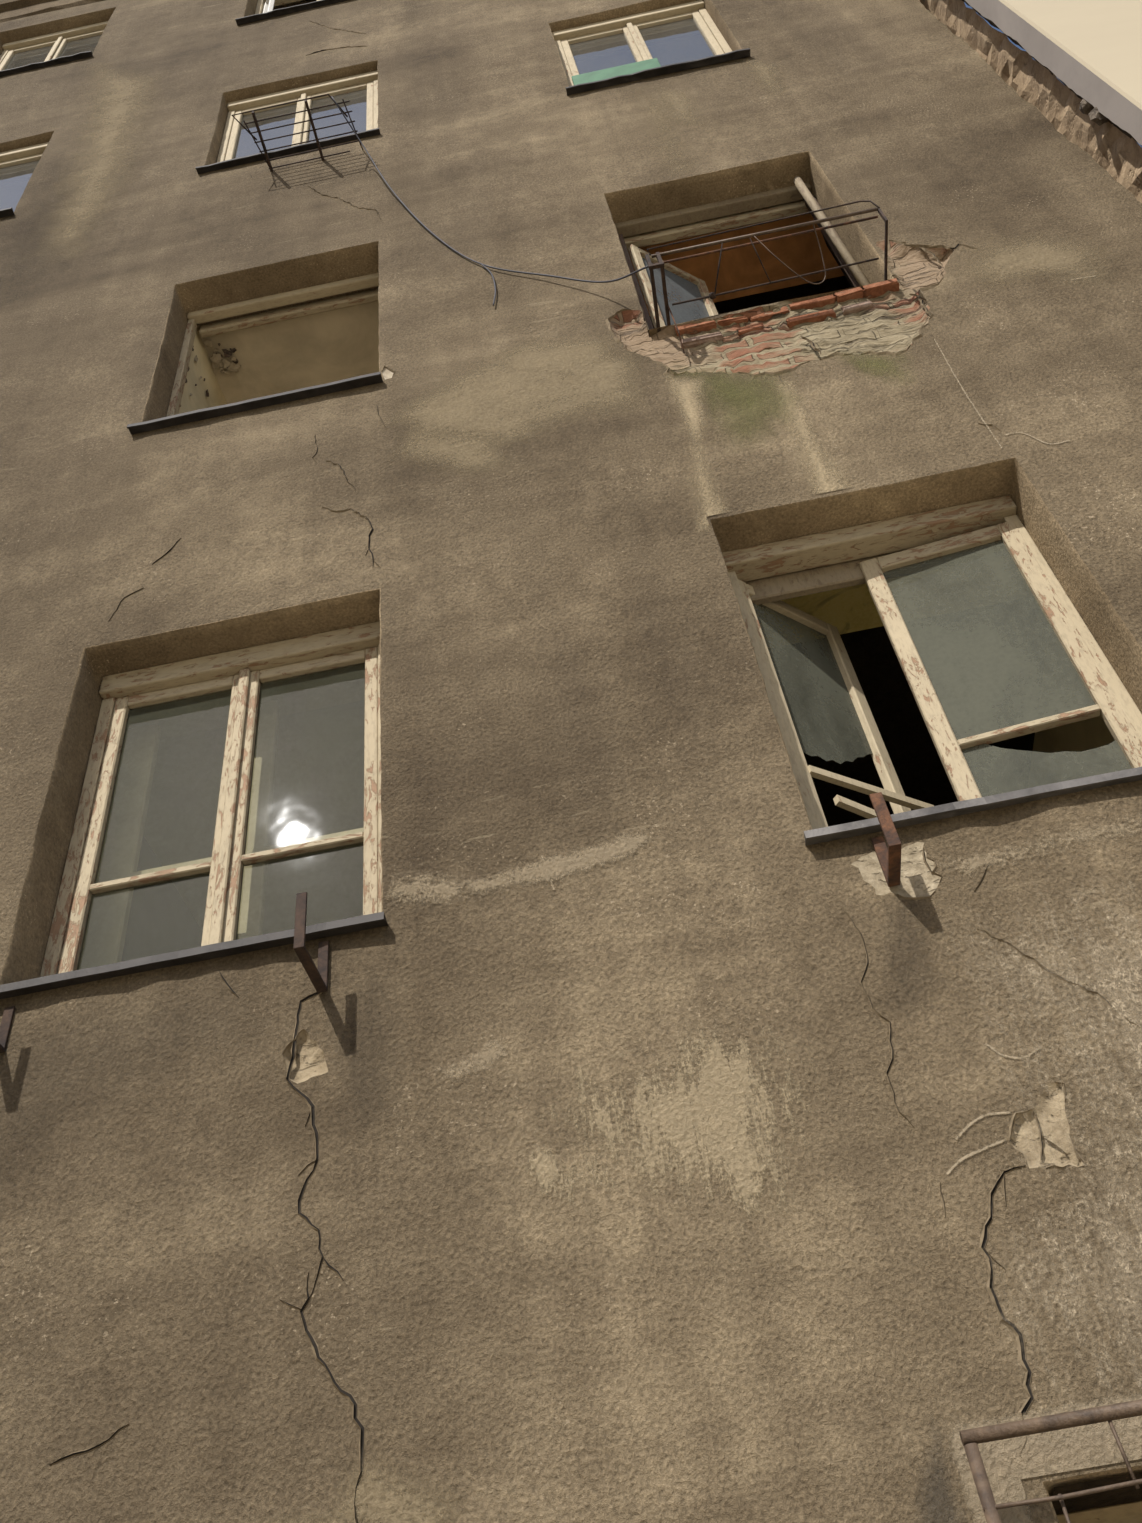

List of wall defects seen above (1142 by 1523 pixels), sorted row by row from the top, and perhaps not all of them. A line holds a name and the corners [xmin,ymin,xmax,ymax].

flaking render [605,239,955,378]
crack [312,435,380,567]
crack [922,848,933,874]
flaking render [851,817,1141,900]
crack [219,971,238,997]
crack [842,908,915,1128]
crack [977,928,1142,1029]
crack [280,984,368,1523]
crack [979,1112,1067,1457]